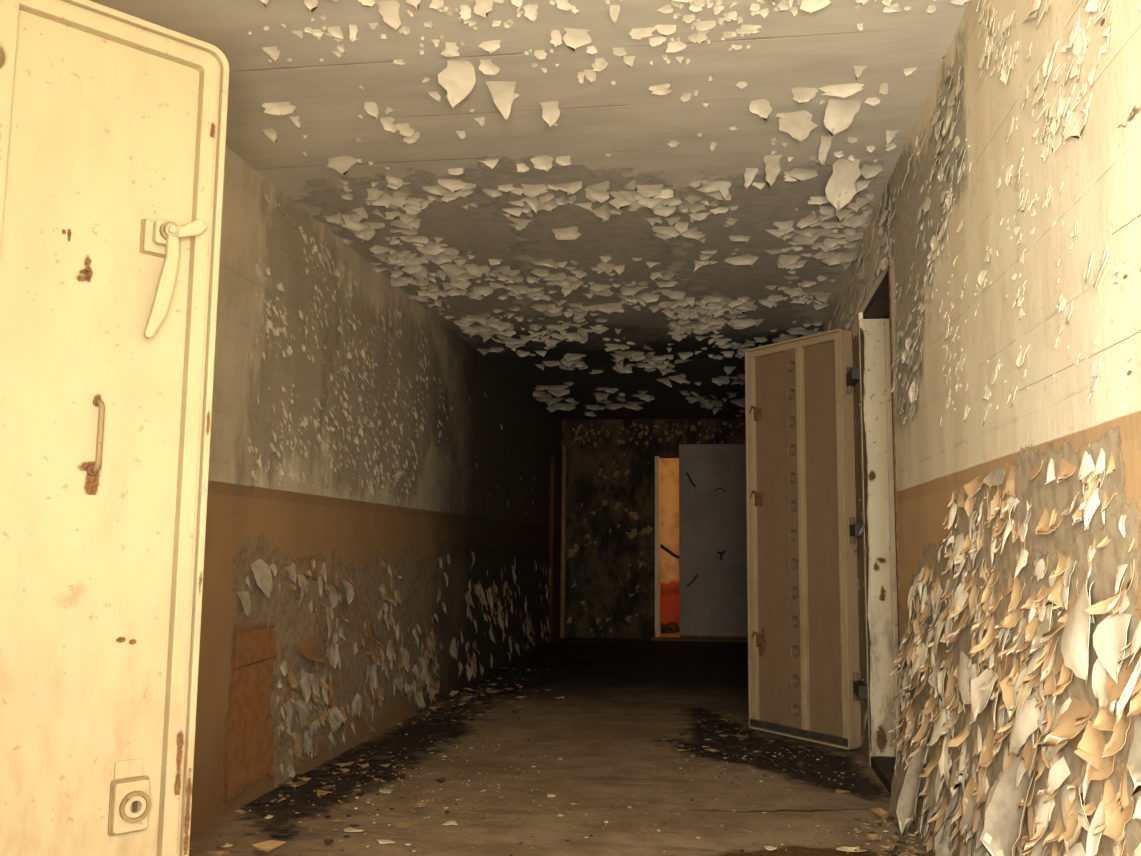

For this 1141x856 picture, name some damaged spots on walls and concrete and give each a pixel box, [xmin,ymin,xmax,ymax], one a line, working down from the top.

peeling [248,0,579,126]
peeling [525,0,831,85]
peeling [854,0,911,13]
peeling [926,0,1051,85]
peeling [997,0,1120,320]
corrosion [77,257,93,282]
peeling [1052,220,1100,402]
peeling [1083,245,1141,294]
peeling [247,52,1029,755]
corrosion [80,462,99,495]
peeling [233,533,551,788]